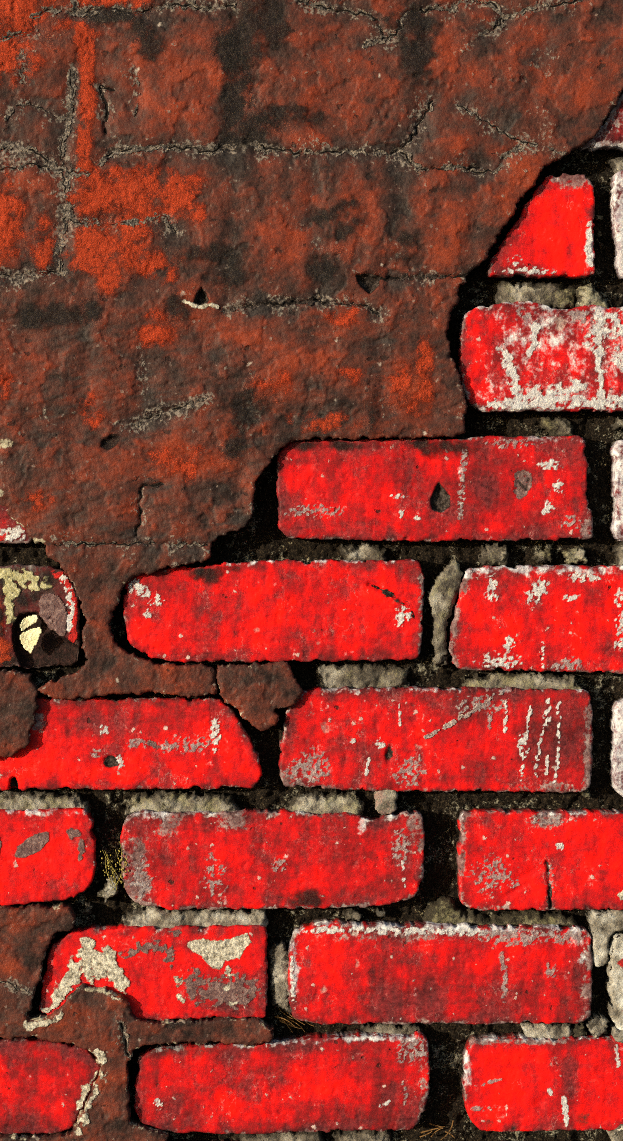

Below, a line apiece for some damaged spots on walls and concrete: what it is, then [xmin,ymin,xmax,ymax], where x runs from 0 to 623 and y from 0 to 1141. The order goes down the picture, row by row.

spalling [182,288,219,309]
spalling [431,482,450,513]
spalling [513,470,532,499]
peeling [0,525,26,542]
peeling [0,568,78,666]
spalling [371,585,414,619]
spalling [103,755,118,768]
peeling [15,832,49,858]
peeling [66,828,85,861]
peeling [23,930,265,1031]
flaking render [75,1048,107,1136]
leakage [547,1089,569,1127]